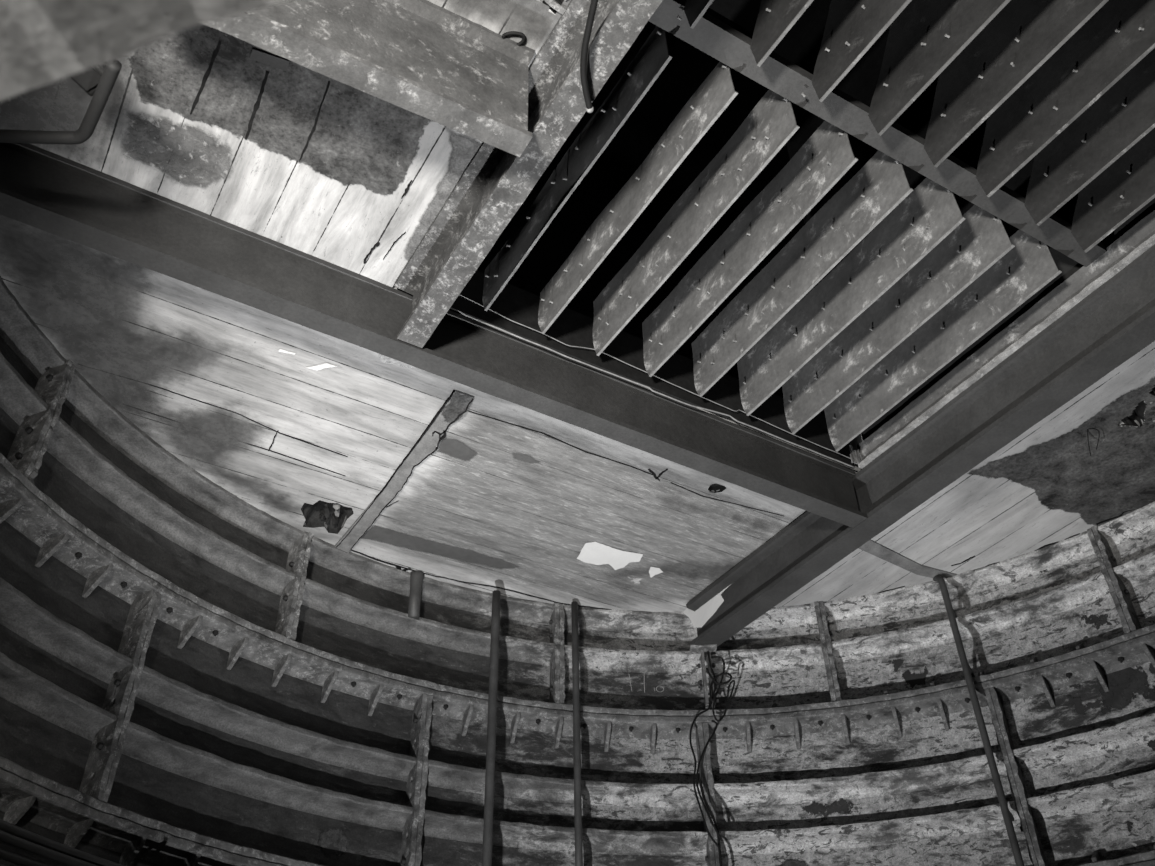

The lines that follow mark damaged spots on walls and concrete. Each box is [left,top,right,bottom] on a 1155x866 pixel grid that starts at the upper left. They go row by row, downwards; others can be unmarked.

spalling [542,0,566,15]
crack [190,40,221,114]
crack [245,71,269,140]
crack [299,81,330,161]
crack [364,232,406,264]
spalling [1118,385,1155,428]
spalling [301,500,353,534]
peeling [577,542,663,584]